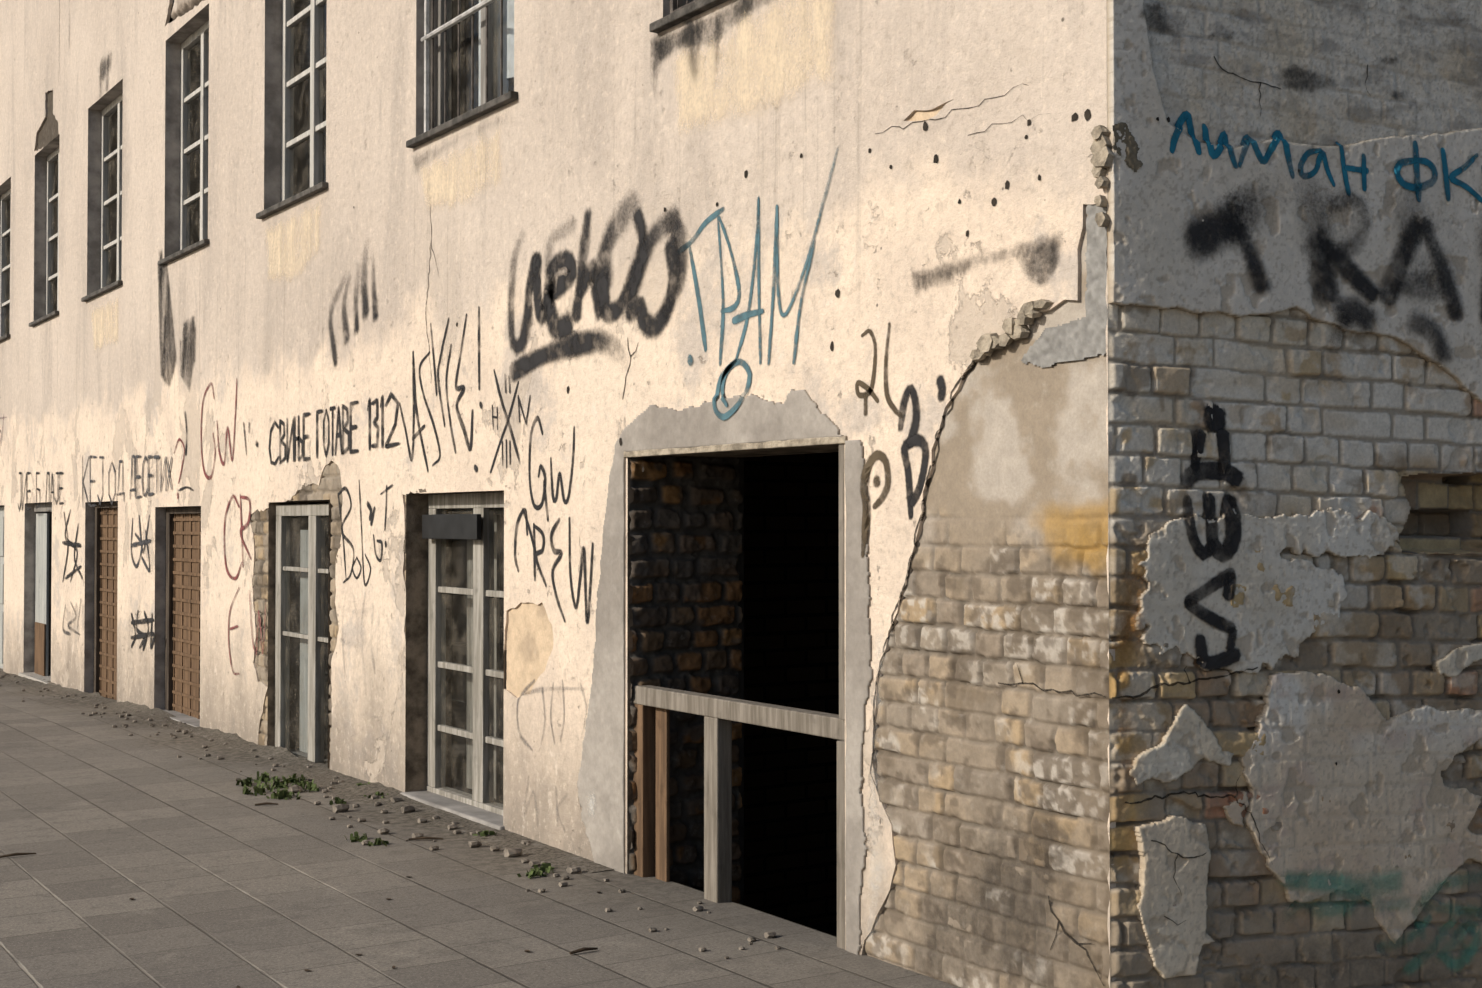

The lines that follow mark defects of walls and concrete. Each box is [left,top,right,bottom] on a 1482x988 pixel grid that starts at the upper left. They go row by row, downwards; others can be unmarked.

water stain [652,0,753,70]
crack [875,83,1050,135]
flaking render [250,509,269,745]
flaking render [288,462,343,754]
flaking render [865,109,1143,988]
flaking render [1129,472,1482,944]
flaking render [1133,814,1215,979]